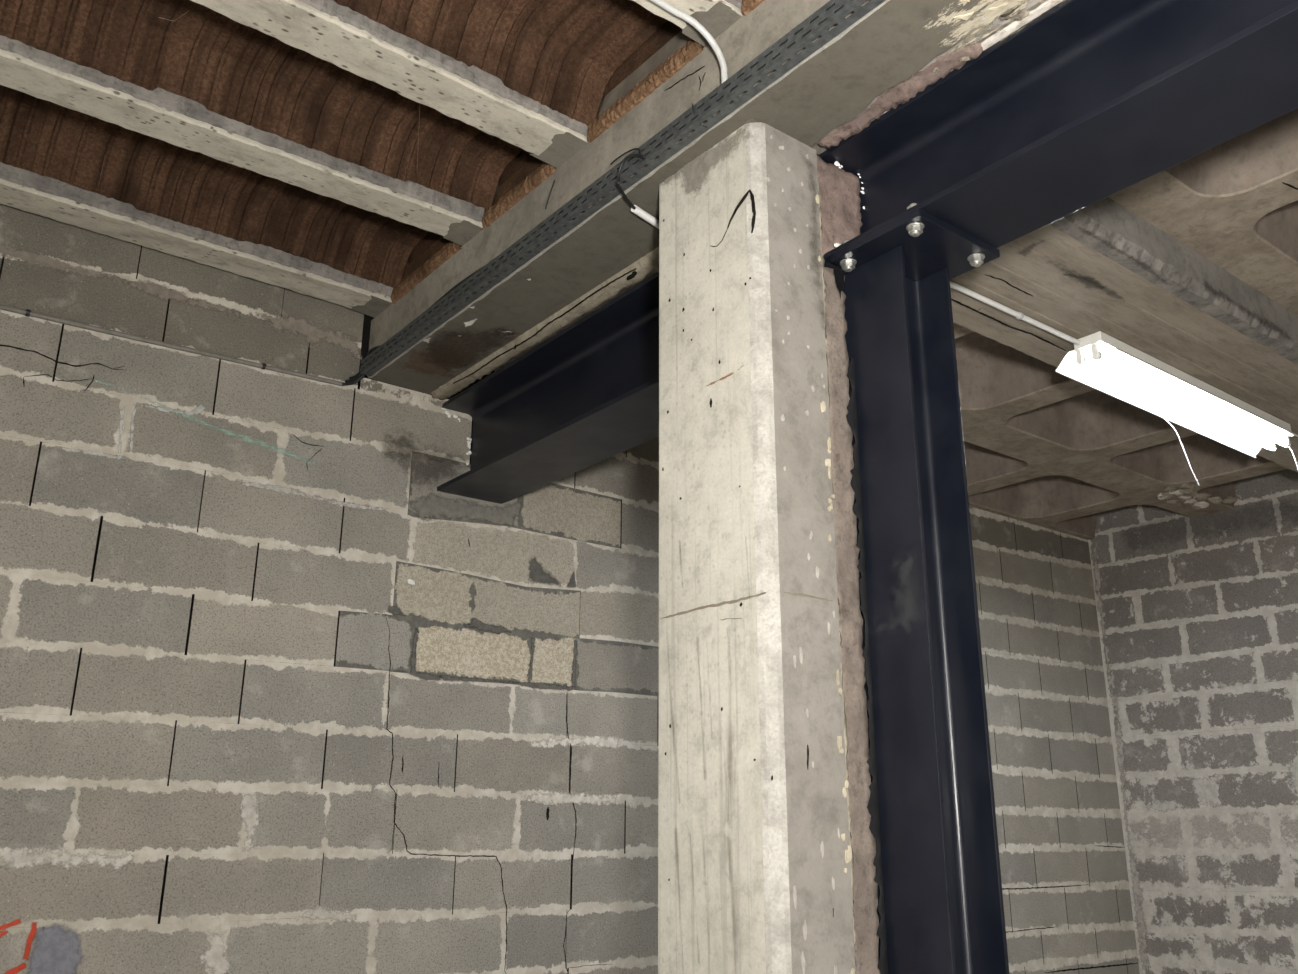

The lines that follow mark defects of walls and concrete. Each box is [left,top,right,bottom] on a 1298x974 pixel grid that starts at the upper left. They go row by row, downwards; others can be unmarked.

peeling [924,0,1059,62]
crack [0,344,123,391]
crack [385,615,507,973]